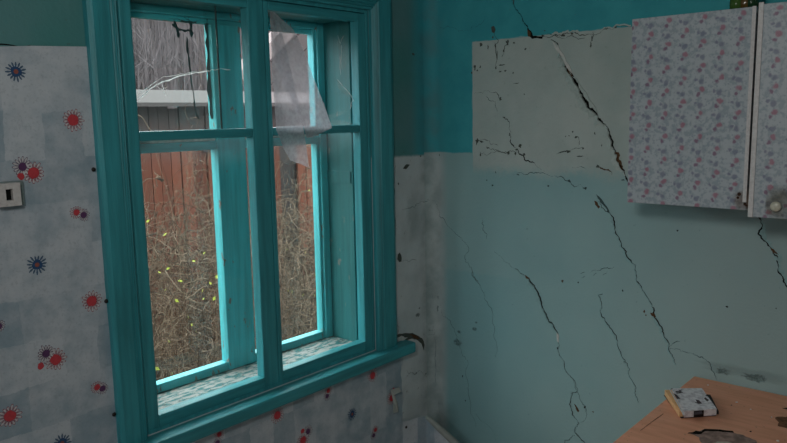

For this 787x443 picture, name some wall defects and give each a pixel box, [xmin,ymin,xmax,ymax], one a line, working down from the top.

flaking render [471,26,632,188]
crack [475,0,717,380]
crack [757,217,787,287]
crack [503,259,594,443]
crack [597,294,639,403]